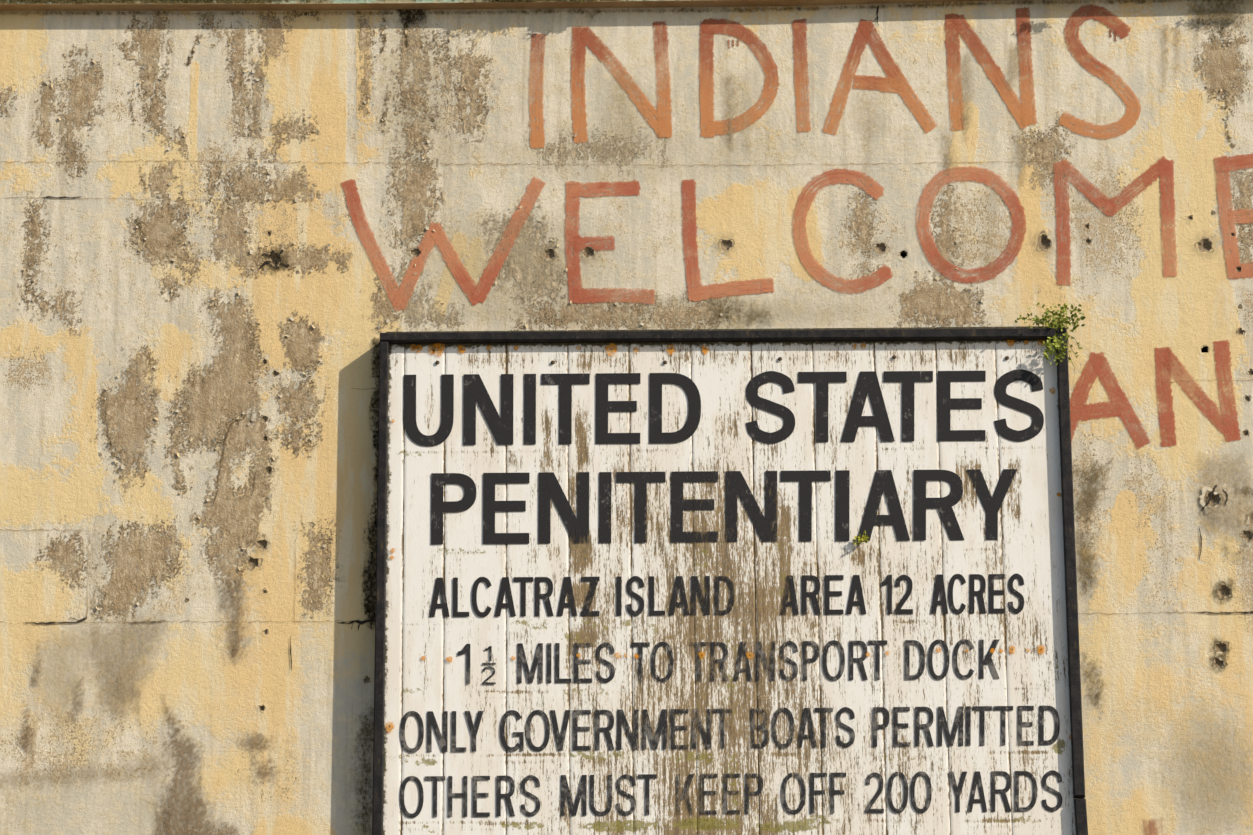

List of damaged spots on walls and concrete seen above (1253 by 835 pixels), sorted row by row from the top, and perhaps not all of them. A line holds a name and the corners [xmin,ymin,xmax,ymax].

peeling [1190,25,1253,150]
peeling [0,10,353,628]
spalling [1199,485,1228,514]
spalling [1212,577,1237,604]
leakage [357,709,374,832]